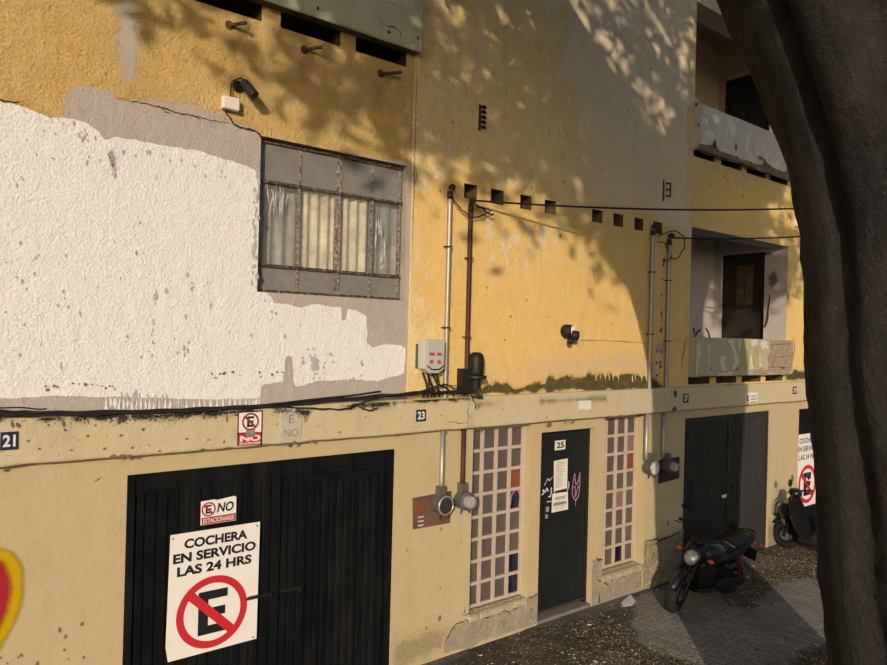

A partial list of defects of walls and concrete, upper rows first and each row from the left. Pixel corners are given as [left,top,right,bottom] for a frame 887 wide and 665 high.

peeling [86,149,182,178]
flaking render [699,140,790,180]
peeling [301,347,335,379]
water stain [341,342,663,411]
flaking render [696,339,793,376]
flaking render [592,520,684,606]
flaking render [443,594,538,653]